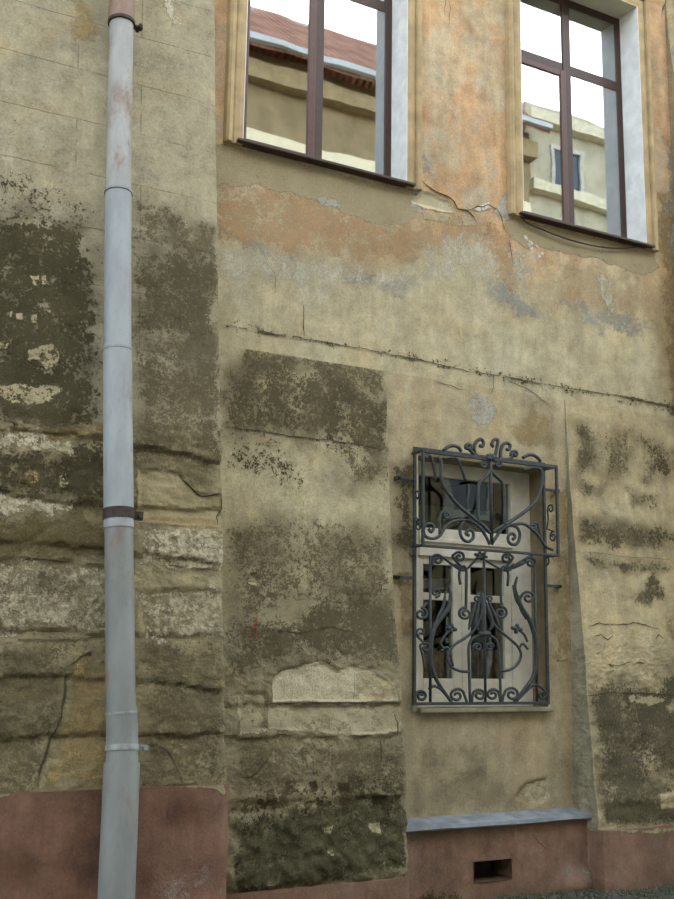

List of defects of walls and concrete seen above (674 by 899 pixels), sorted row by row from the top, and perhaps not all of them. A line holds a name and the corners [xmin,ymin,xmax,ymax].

crack [422,181,513,261]
water stain [0,171,105,564]
crack [224,300,674,408]
spalling [0,427,74,456]
spalling [0,487,75,517]
spalling [0,555,105,639]
spalling [135,469,223,571]
spalling [139,582,223,644]
water stain [131,200,413,856]
water stain [577,518,674,606]
crack [38,650,95,781]
water stain [591,676,674,827]